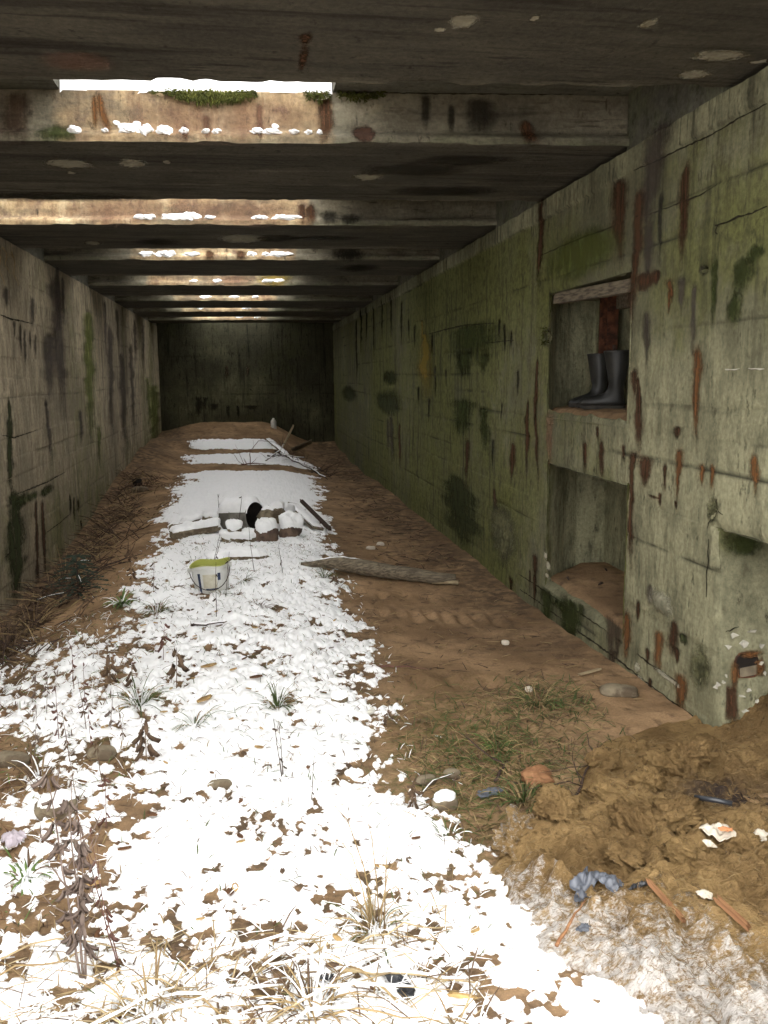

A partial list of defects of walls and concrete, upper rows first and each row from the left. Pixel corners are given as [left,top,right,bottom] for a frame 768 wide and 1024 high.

rust [92,95,110,129]
damp [422,96,430,124]
damp [468,100,494,132]
crack [635,103,767,170]
rust [610,178,673,318]
rust [679,163,690,257]
crack [715,206,767,234]
rust [692,348,702,437]
rust [583,427,604,475]
rust [622,369,683,553]
damp [5,398,27,603]
peeling [725,630,765,650]